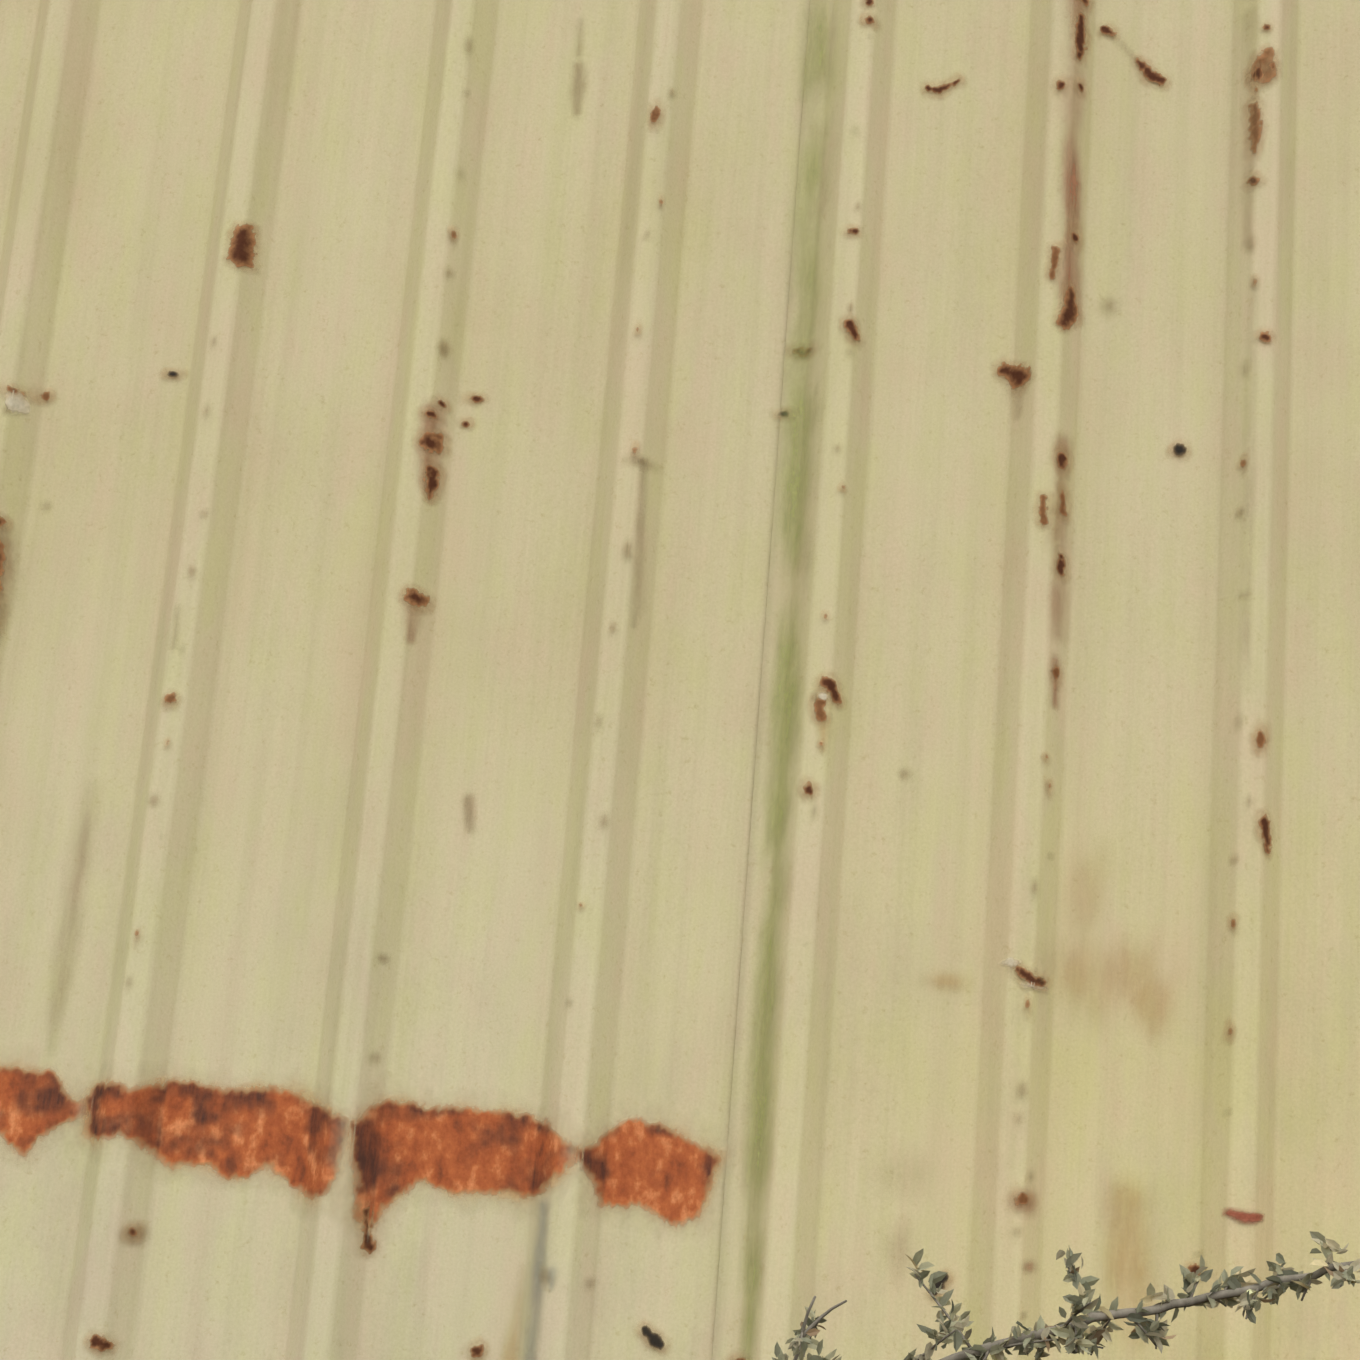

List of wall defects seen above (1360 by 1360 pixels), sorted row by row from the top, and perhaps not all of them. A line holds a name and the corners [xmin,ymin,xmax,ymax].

rust [1075,0,1089,61]
rust [1056,80,1084,92]
rust [1248,47,1277,153]
rust [226,224,257,268]
rust [1049,158,1079,330]
rust [997,362,1031,389]
rust [419,400,447,500]
rust [814,676,842,722]
rust [1258,814,1272,854]
rust [0,1066,722,1254]